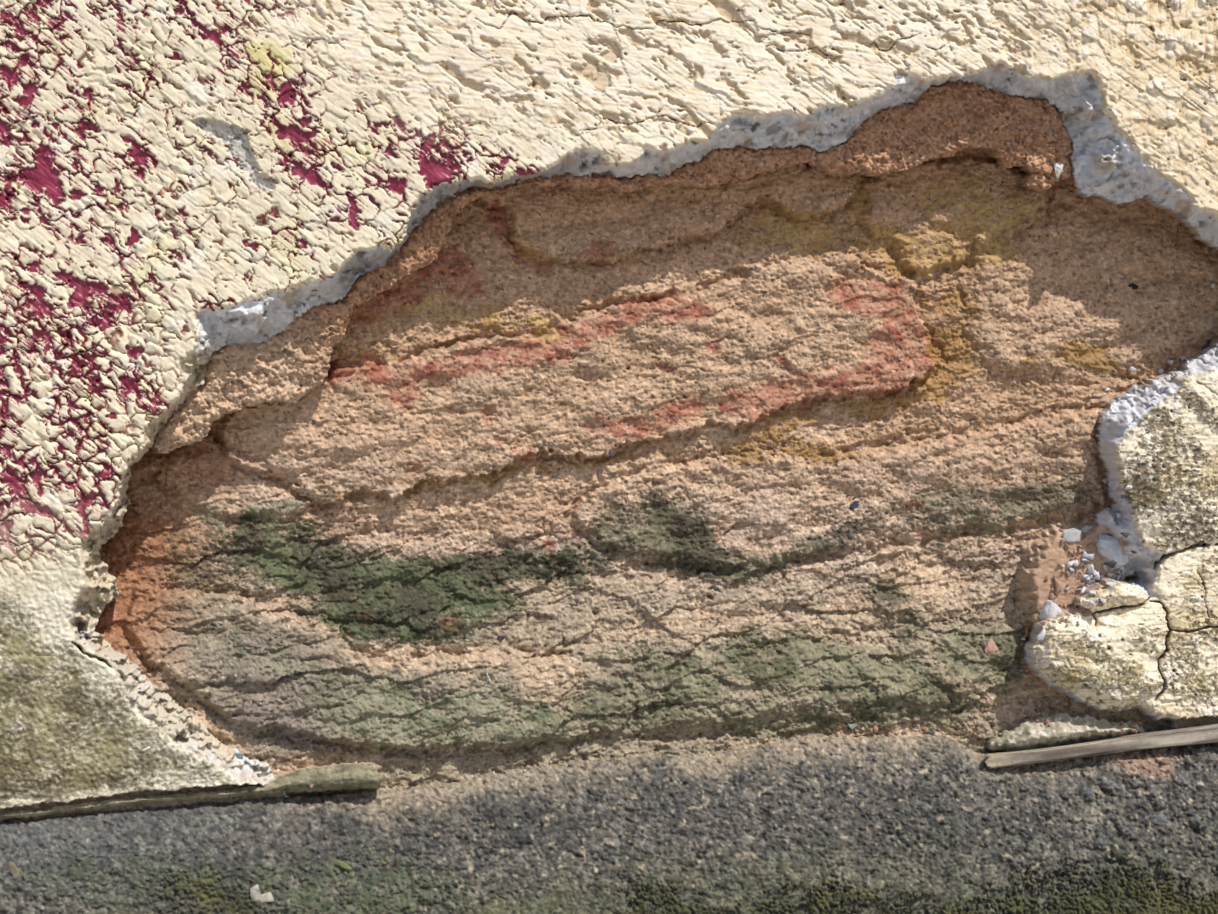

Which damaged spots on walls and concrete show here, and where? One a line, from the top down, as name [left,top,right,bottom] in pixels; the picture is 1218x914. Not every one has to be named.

peeling [0,0,125,250]
peeling [168,0,360,196]
peeling [366,118,389,134]
peeling [125,227,142,247]
peeling [114,131,157,181]
peeling [269,204,315,260]
peeling [325,192,361,230]
peeling [364,164,407,203]
peeling [0,233,145,436]
peeling [42,396,112,453]
peeling [25,526,59,556]
crack [1155,542,1218,630]